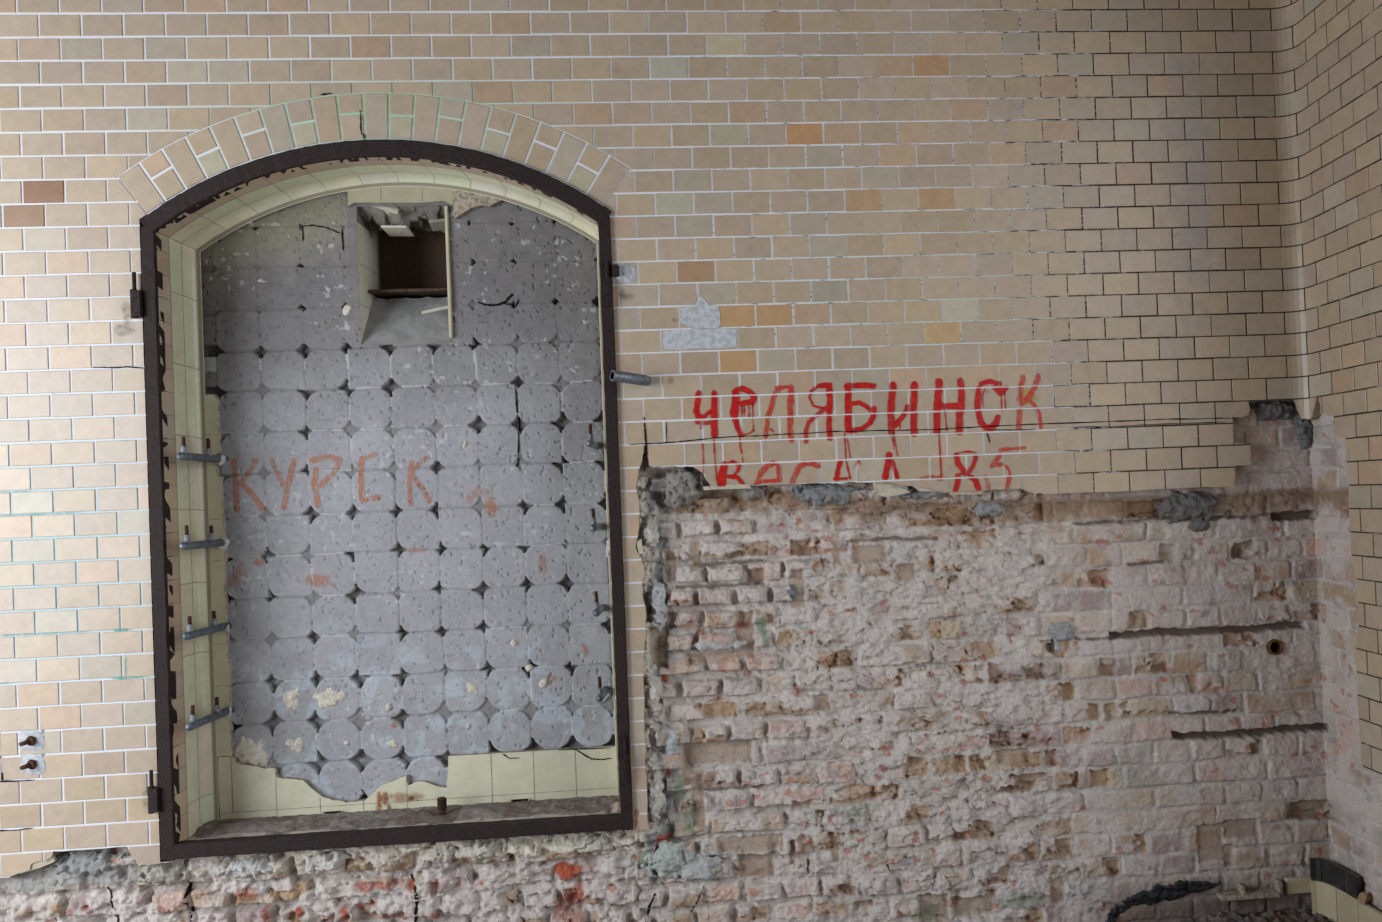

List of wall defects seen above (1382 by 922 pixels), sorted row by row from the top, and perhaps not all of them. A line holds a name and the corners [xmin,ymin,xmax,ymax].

crack [301,224,344,250]
crack [478,294,519,307]
crack [514,386,522,467]
crack [630,417,1227,468]
spalling [200,190,619,801]
spalling [0,400,1382,922]